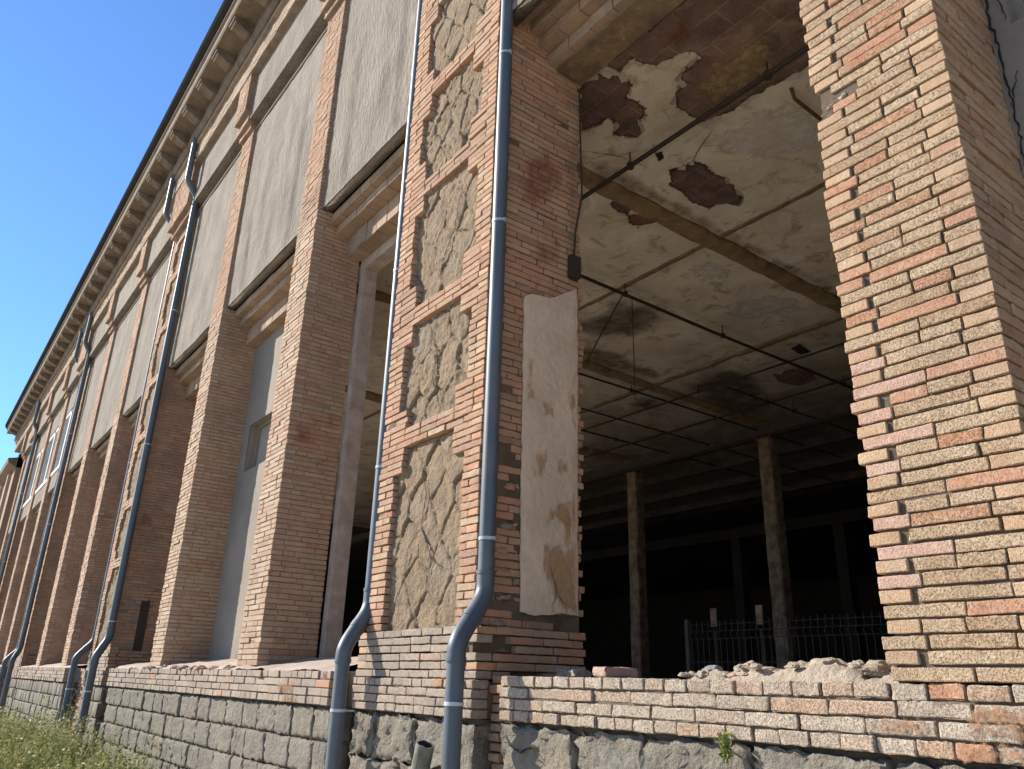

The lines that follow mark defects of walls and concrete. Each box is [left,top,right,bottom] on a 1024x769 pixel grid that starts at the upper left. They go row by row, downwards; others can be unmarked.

peeling [578,0,810,139]
crack [985,0,1024,159]
peeling [668,161,744,210]
peeling [610,201,655,229]
leakage [581,307,656,335]
leakage [544,503,577,611]
spalling [678,659,909,684]